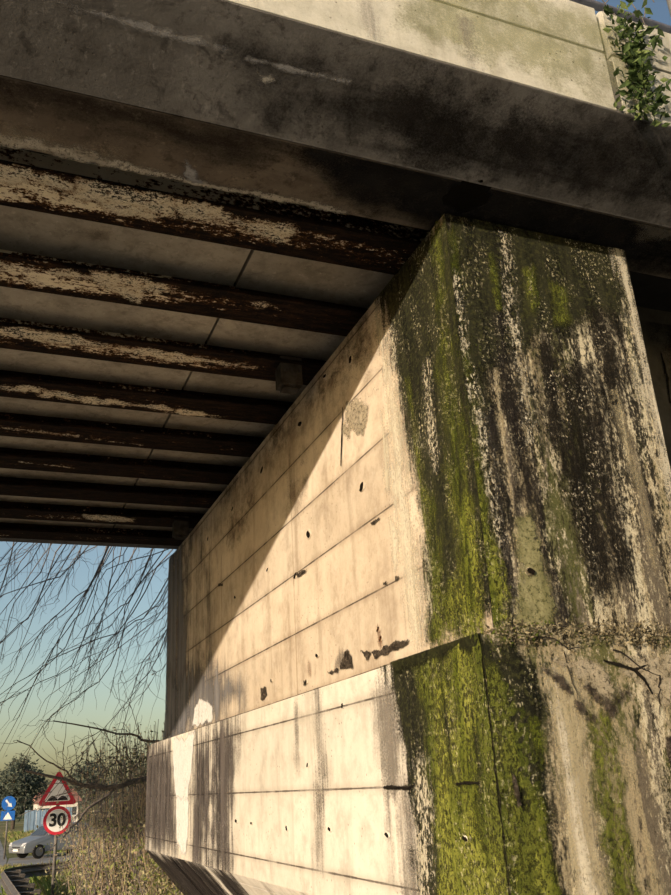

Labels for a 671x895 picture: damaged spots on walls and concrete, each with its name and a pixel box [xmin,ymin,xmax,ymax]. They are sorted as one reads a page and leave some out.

peeling [0,164,299,244]
peeling [0,260,193,304]
peeling [0,326,258,369]
leakage [0,10,671,648]
peeling [0,383,227,418]
peeling [342,398,368,439]
peeling [83,514,138,523]
leakage [145,539,248,895]
leakage [376,682,419,895]
leakage [545,667,613,895]